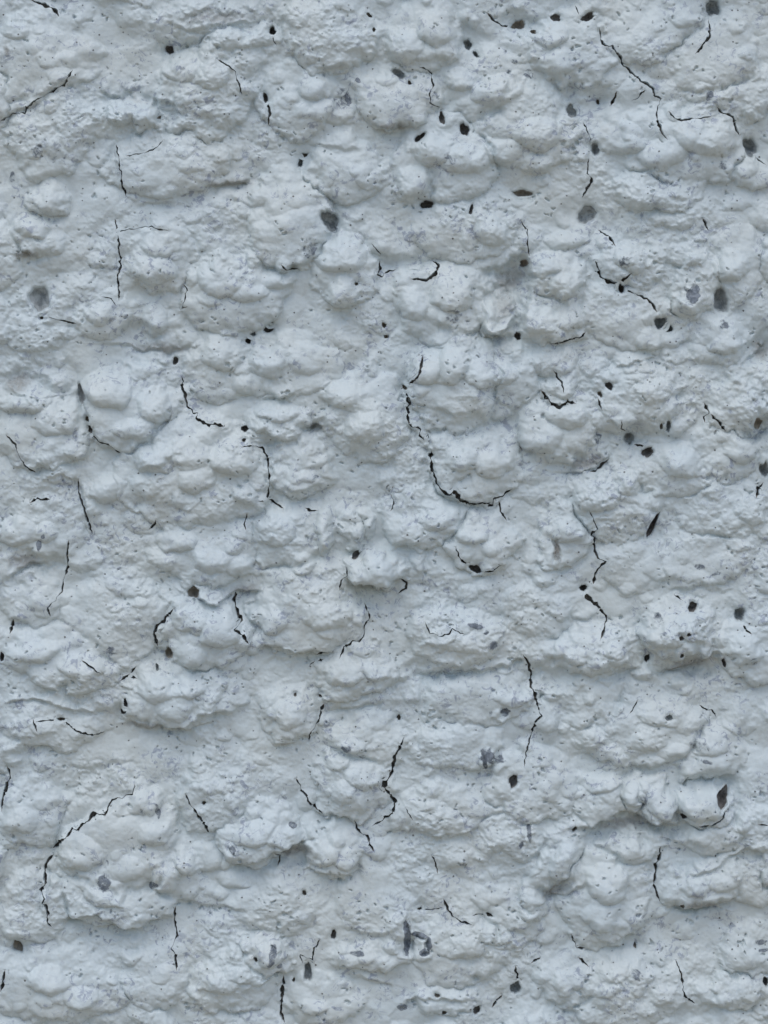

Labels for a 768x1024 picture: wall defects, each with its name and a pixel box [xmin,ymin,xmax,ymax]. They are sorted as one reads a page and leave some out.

crack [572,4,742,142]
crack [101,139,169,307]
crack [592,228,659,313]
crack [177,375,225,431]
crack [403,355,513,522]
crack [43,478,95,617]
crack [228,591,252,645]
crack [582,510,611,642]
crack [521,653,546,768]
crack [35,782,138,930]
crack [351,735,415,853]
crack [650,847,665,903]